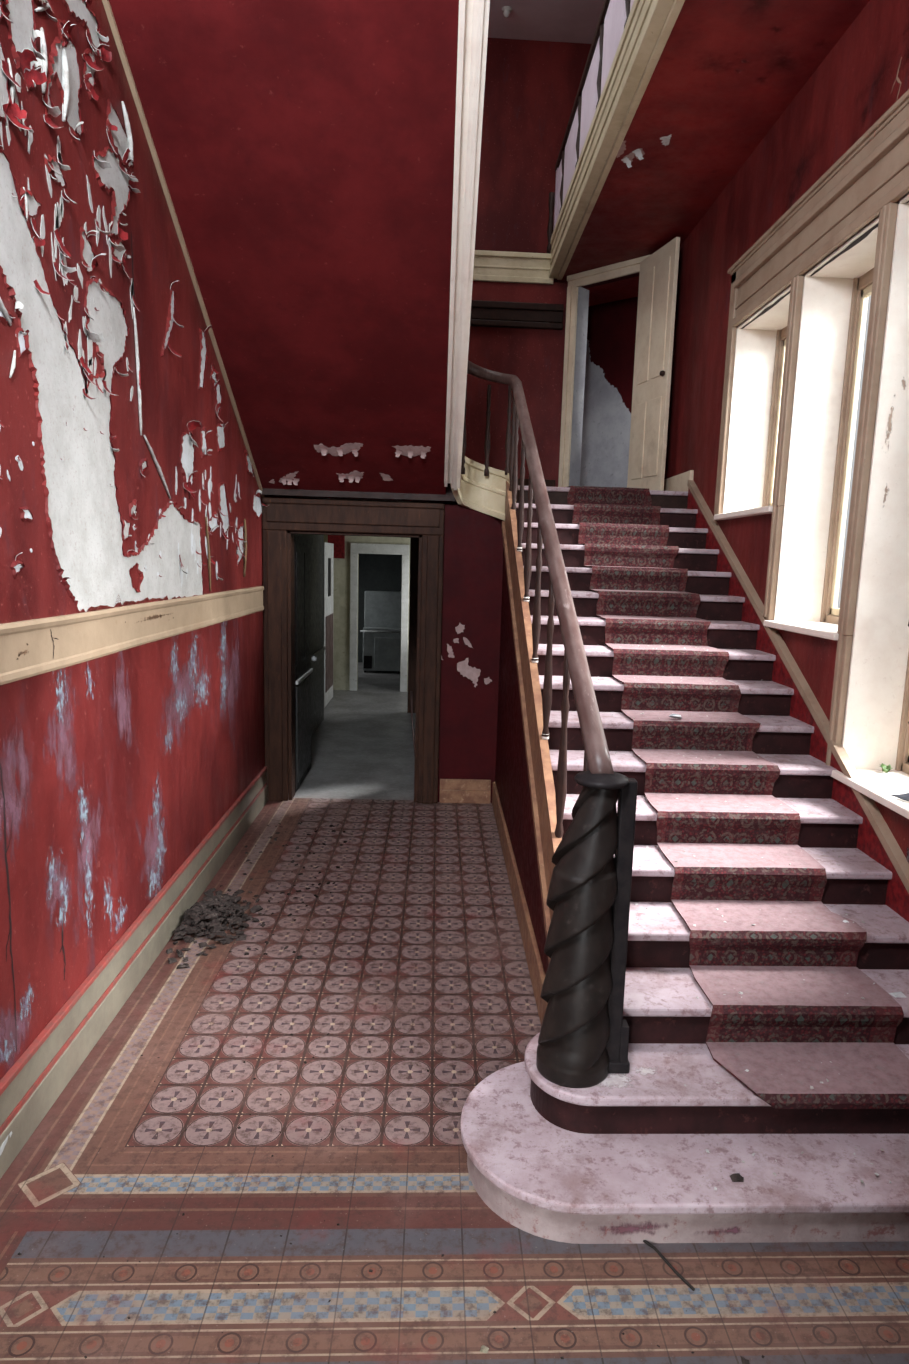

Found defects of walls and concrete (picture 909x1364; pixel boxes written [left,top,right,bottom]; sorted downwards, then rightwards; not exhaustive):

peeling [0,0,299,613]
peeling [314,442,364,483]
peeling [392,445,431,459]
water stain [114,651,132,745]
water stain [162,622,240,754]
peeling [441,623,492,687]
water stain [0,730,29,849]
water stain [46,671,127,933]
water stain [139,776,167,900]
water stain [0,977,34,1066]